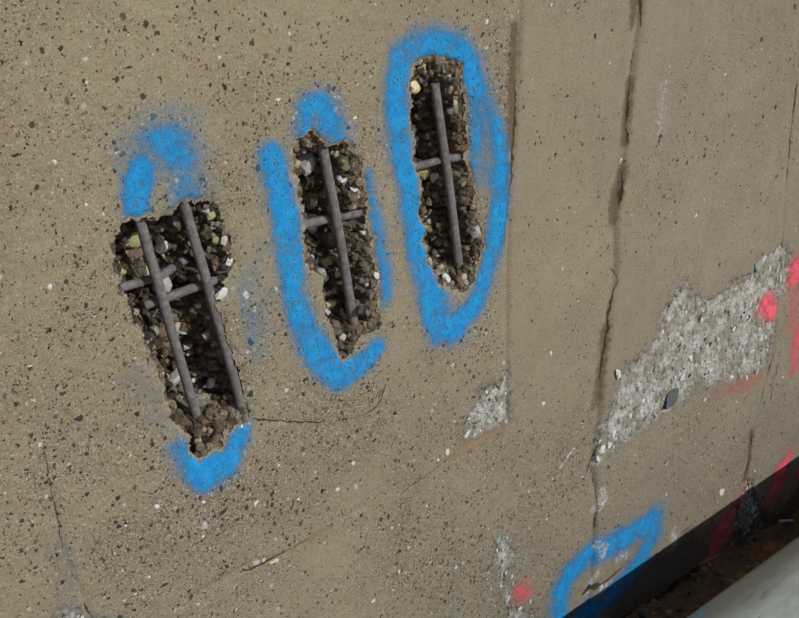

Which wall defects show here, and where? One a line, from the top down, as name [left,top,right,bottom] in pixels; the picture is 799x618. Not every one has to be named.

spalling [110,200,251,458]
spalling [291,130,381,359]
spalling [409,55,484,292]
spalling [459,357,523,442]
crack [599,268,618,378]
crack [617,177,625,204]
crack [625,51,634,143]
spalling [590,236,799,467]